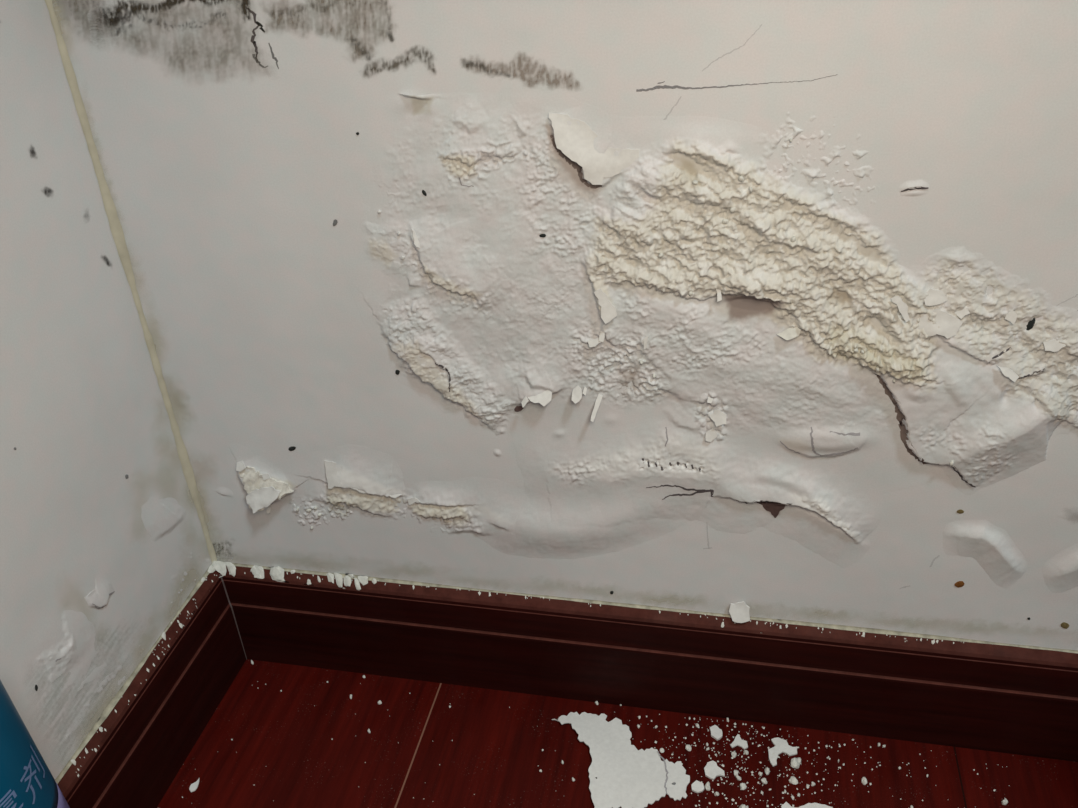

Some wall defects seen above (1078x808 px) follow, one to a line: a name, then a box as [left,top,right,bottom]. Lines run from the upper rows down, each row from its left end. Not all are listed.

damp [53,0,223,33]
damp [317,0,435,75]
damp [466,56,578,87]
peeling [360,93,451,137]
spalling [532,93,1078,435]
peeling [215,444,483,539]
crack [646,485,714,500]
peeling [26,576,115,691]